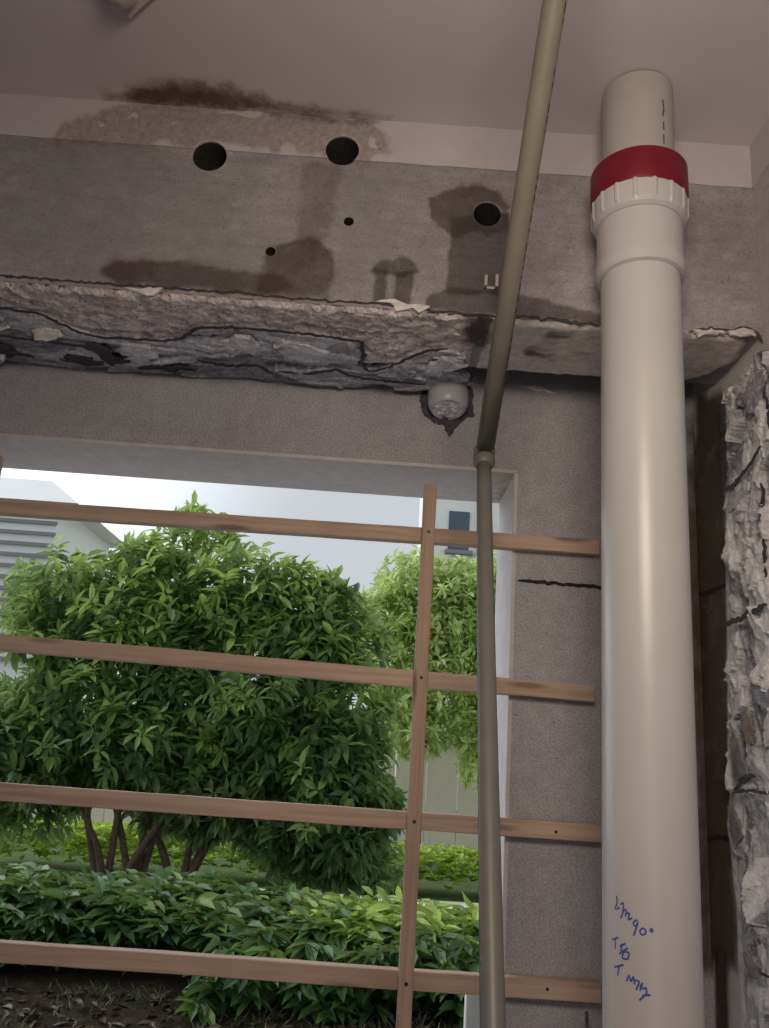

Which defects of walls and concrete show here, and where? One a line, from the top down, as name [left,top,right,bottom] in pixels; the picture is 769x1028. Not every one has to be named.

damp [432,187,500,232]
damp [108,240,332,294]
spalling [0,274,495,438]
spalling [507,314,601,394]
crack [518,579,601,590]
spalling [683,326,769,1028]